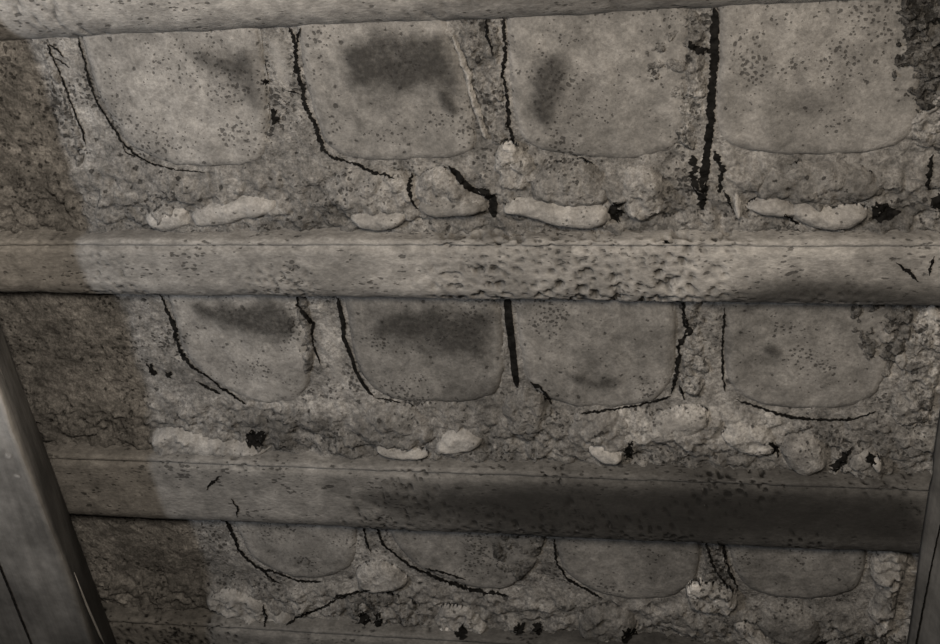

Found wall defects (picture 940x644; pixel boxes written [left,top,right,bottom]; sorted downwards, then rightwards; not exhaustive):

water stain [347,37,454,113]
water stain [534,57,562,121]
crack [896,256,935,282]
water stain [197,305,291,335]
water stain [379,309,486,357]
crack [0,565,32,644]
crack [915,525,940,644]